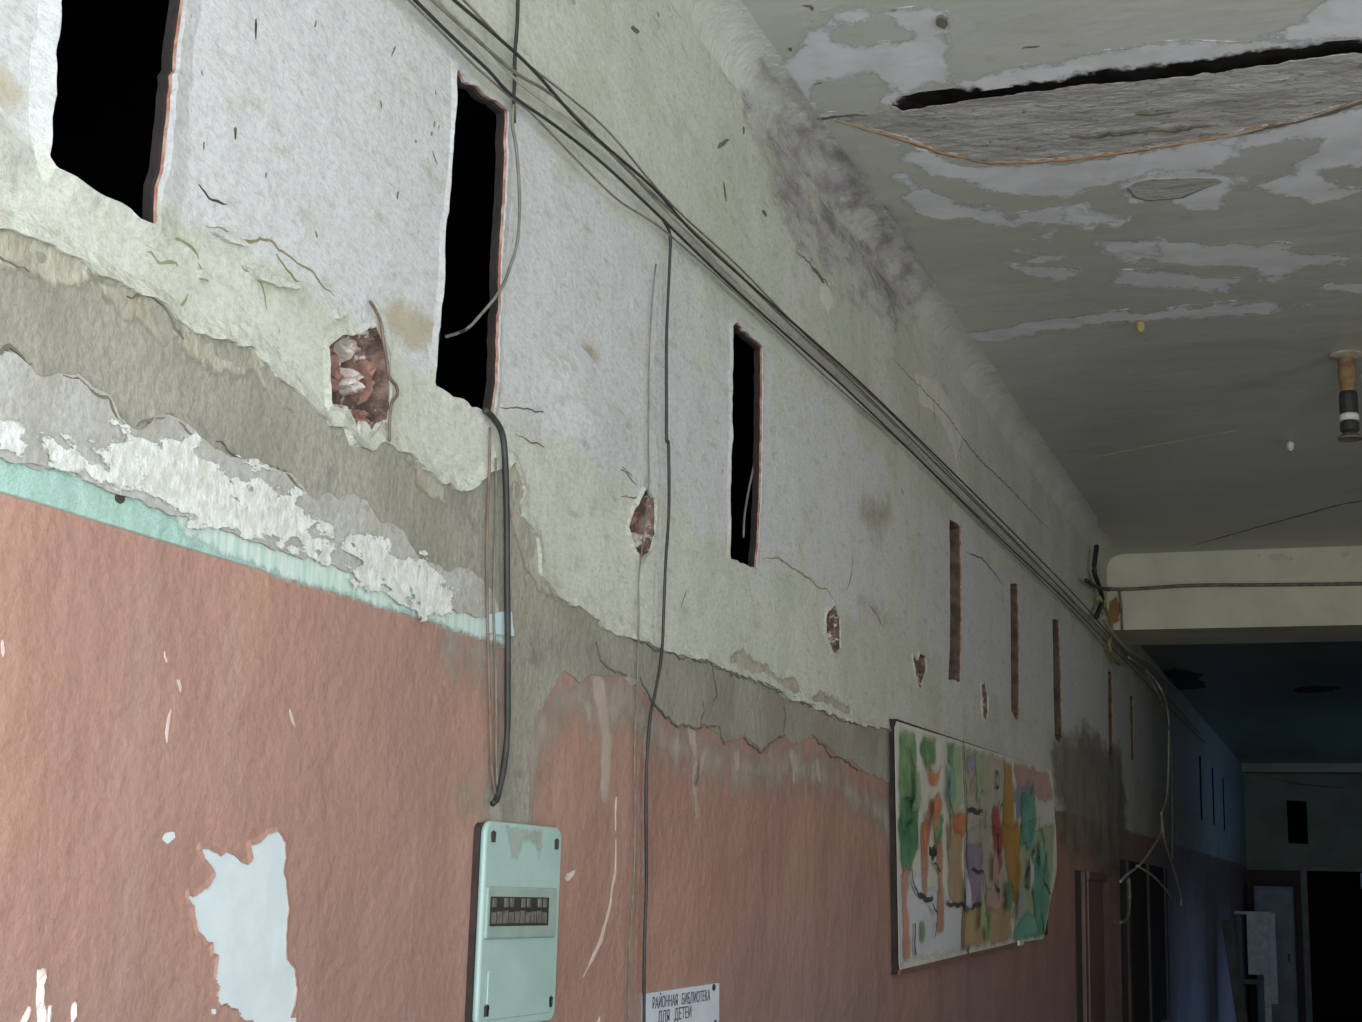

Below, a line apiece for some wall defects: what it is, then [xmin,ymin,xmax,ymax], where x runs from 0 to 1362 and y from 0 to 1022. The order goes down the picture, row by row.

damp [764,66,933,314]
spalling [781,0,1362,342]
spalling [0,202,891,825]
peeling [915,373,964,466]
peeling [162,832,175,844]
peeling [185,827,299,1022]